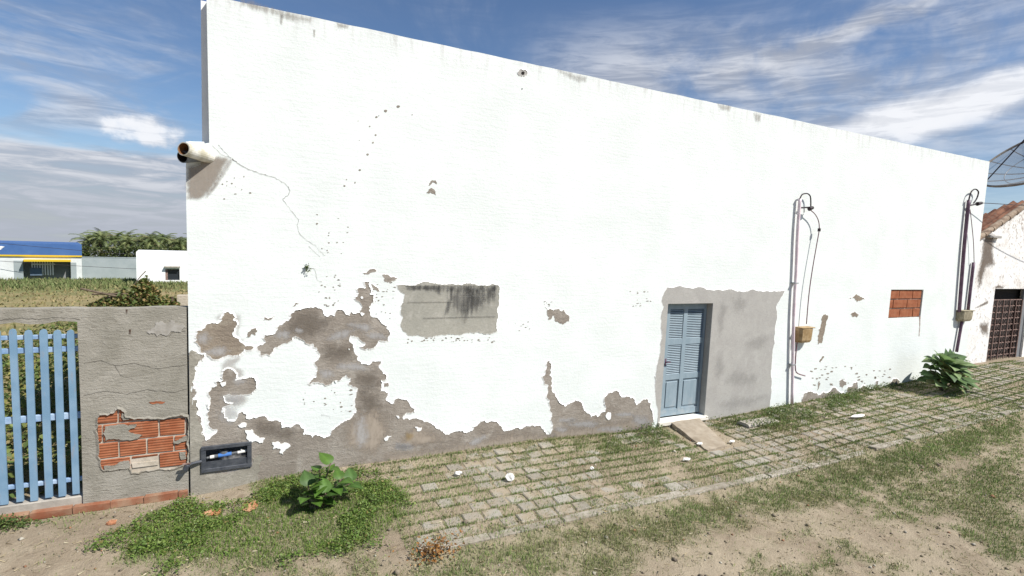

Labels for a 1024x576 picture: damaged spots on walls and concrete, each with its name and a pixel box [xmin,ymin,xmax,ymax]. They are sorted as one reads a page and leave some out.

damp [188,157,227,198]
peeling [93,268,654,481]
peeling [801,314,900,402]